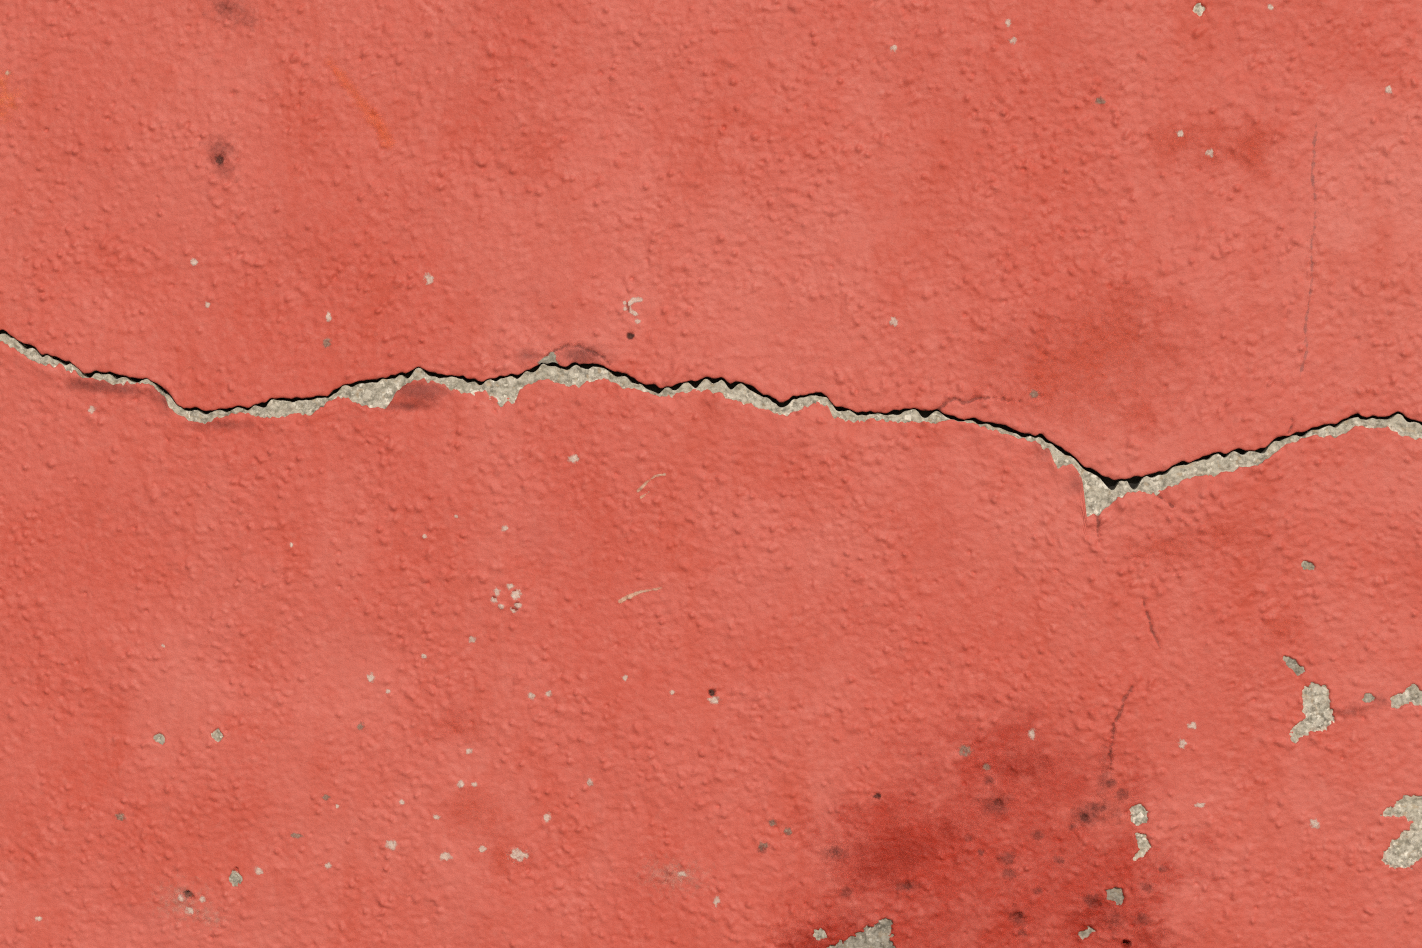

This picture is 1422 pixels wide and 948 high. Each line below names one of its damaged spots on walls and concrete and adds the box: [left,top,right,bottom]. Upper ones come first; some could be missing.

crack [0,330,1422,517]
peeling [1283,656,1334,743]
peeling [1362,684,1422,709]
peeling [1380,795,1422,869]
peeling [813,917,896,948]